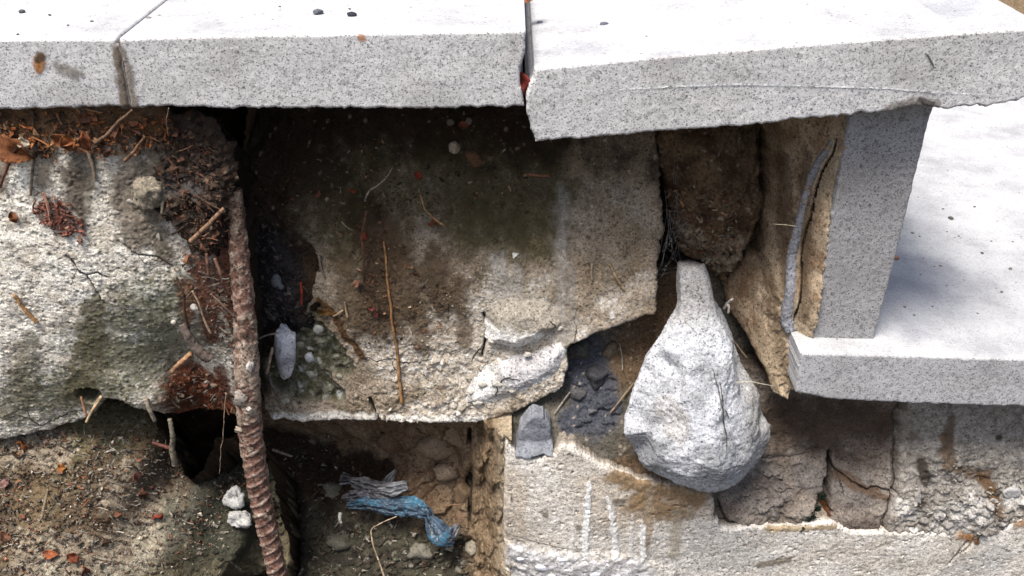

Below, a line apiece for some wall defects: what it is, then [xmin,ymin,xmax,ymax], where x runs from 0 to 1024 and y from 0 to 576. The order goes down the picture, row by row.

spalling [114,234,143,246]
water stain [335,213,472,354]
crack [793,140,837,320]
spalling [264,306,355,403]
crack [761,402,900,526]
spalling [909,458,931,534]
spalling [942,487,1024,537]